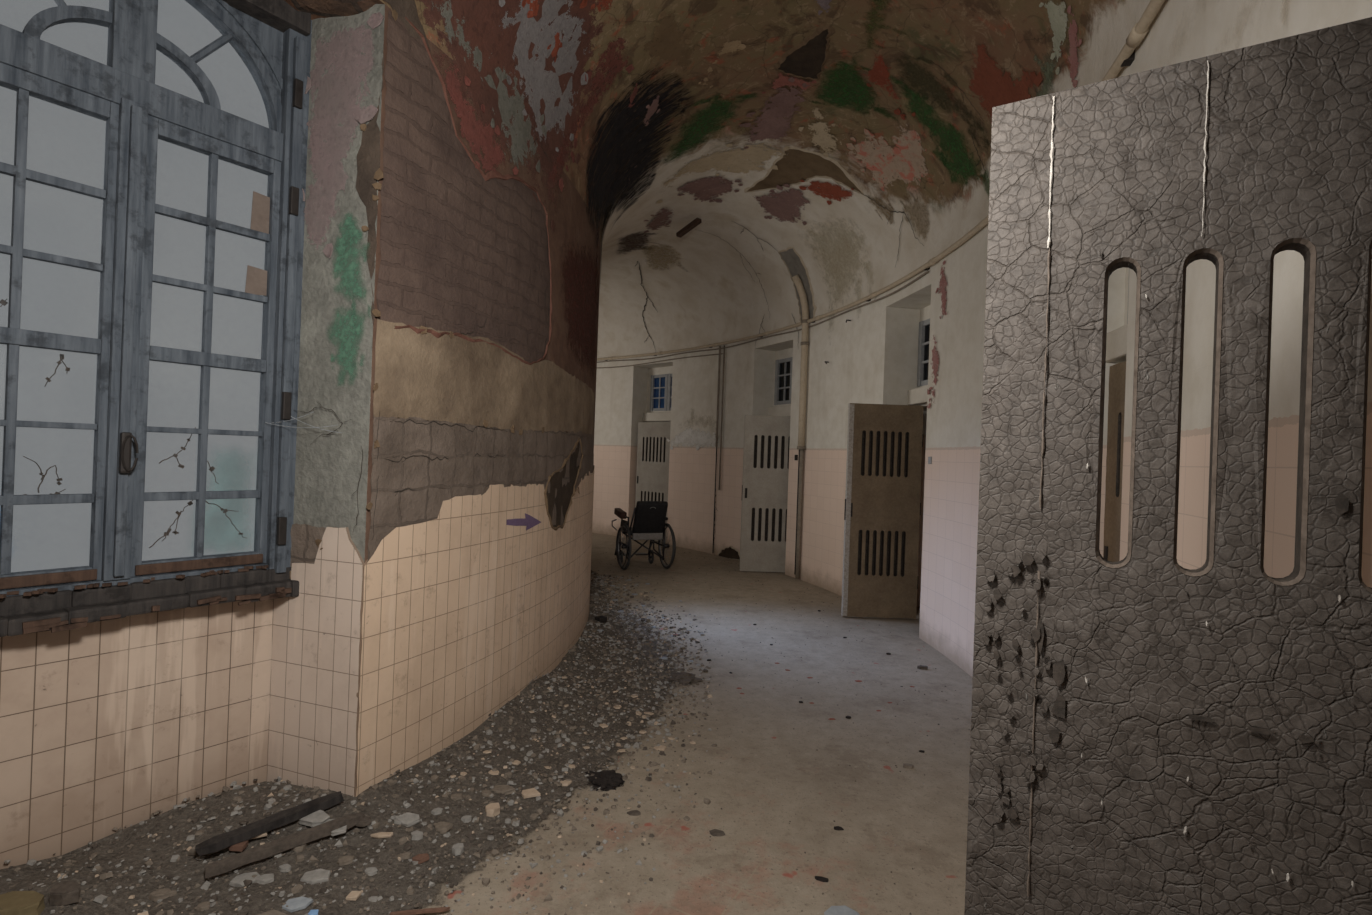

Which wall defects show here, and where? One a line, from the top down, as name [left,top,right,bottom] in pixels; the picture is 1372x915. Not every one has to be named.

peeling [384,0,616,232]
peeling [628,83,660,126]
peeling [644,0,929,233]
peeling [968,1,1082,124]
flaking render [356,53,595,561]
crack [635,261,658,347]
flaking render [778,247,817,322]
peeling [935,261,948,319]
peeling [927,335,939,408]
flaking render [717,546,740,561]